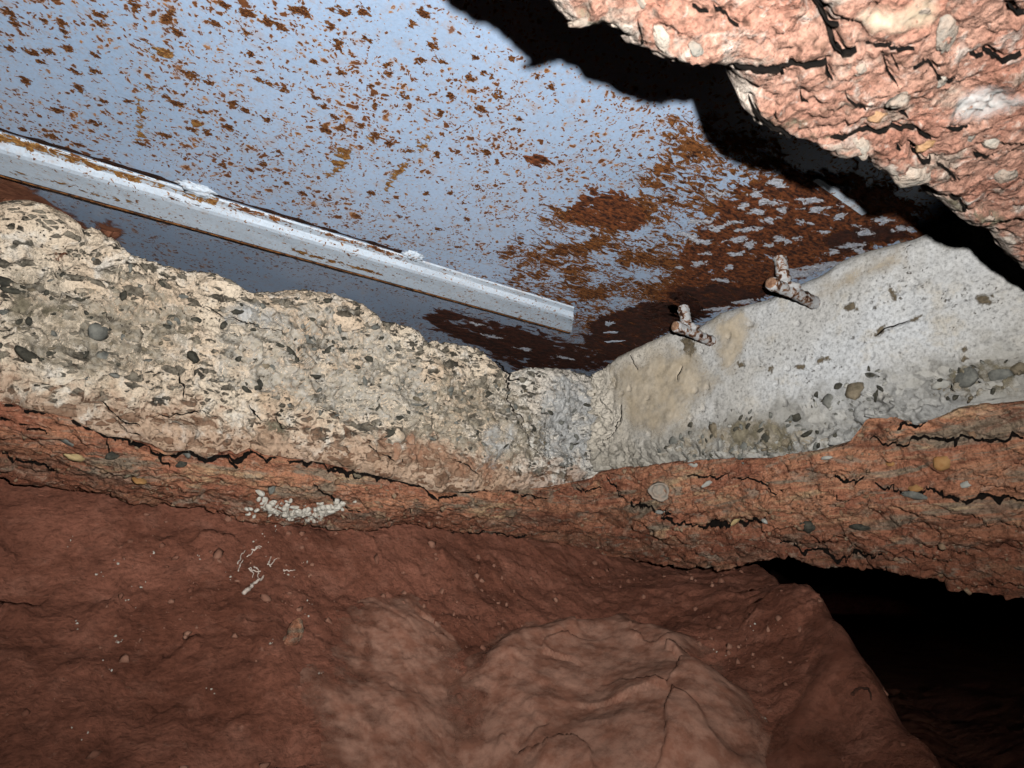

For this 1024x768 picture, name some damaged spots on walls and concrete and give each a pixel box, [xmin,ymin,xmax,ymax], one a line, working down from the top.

corrosion [0,15,74,65]
corrosion [217,0,311,58]
corrosion [323,4,372,53]
corrosion [122,76,235,148]
corrosion [0,95,956,372]
spalling [975,294,994,304]
spalling [930,347,1024,403]
crack [71,355,548,512]
spalling [657,366,888,464]
crack [870,421,1024,447]
crack [575,474,783,530]
crack [835,474,1024,505]